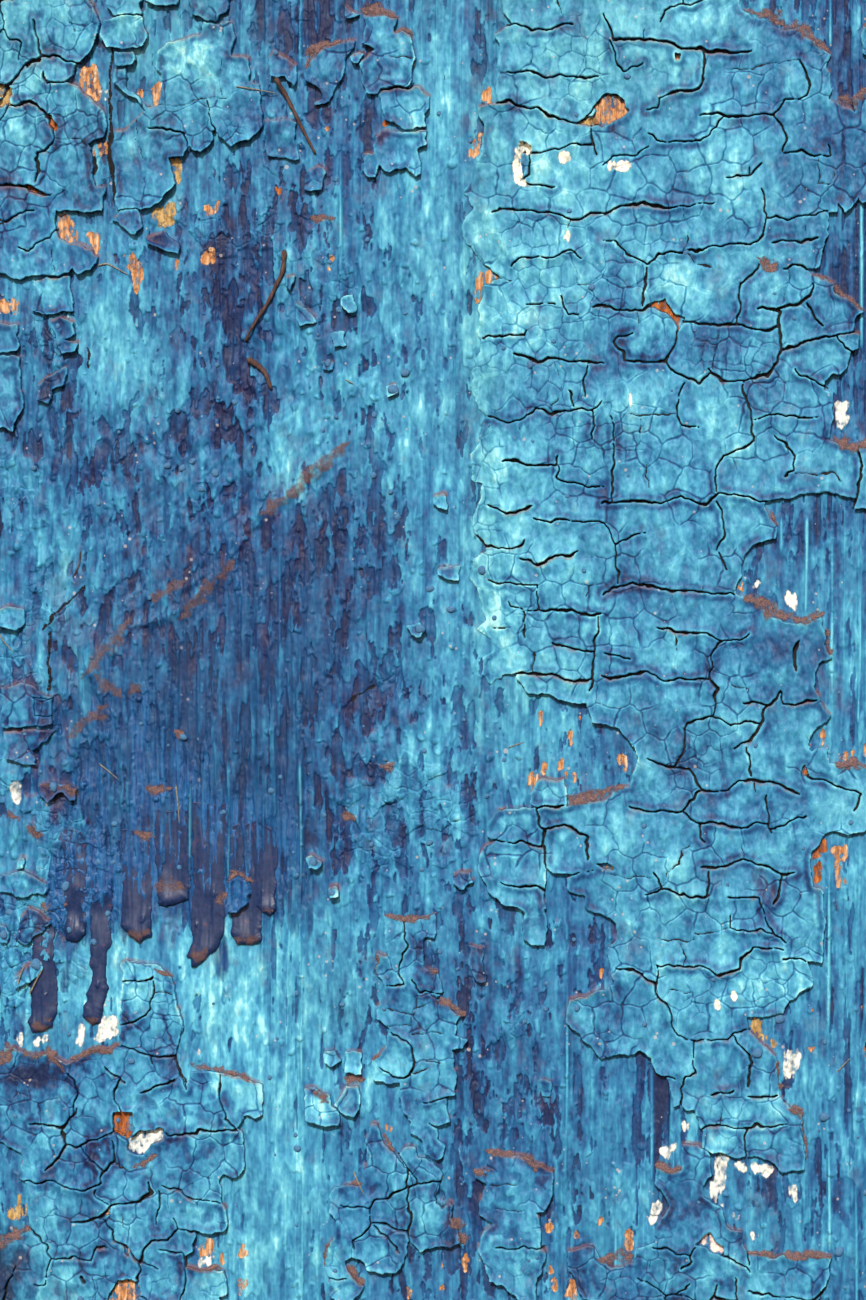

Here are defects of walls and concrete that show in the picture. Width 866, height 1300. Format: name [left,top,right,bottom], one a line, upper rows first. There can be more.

crack [0,0,233,270]
corrosion [262,442,349,514]
peeling [433,493,449,510]
corrosion [181,561,234,618]
corrosion [67,620,141,738]
peeling [437,0,866,1300]
corrosion [836,757,866,769]
crack [106,976,187,1096]
peeling [304,914,469,1300]
crack [25,1077,220,1300]
crack [344,1153,442,1250]
crack [638,1247,827,1300]